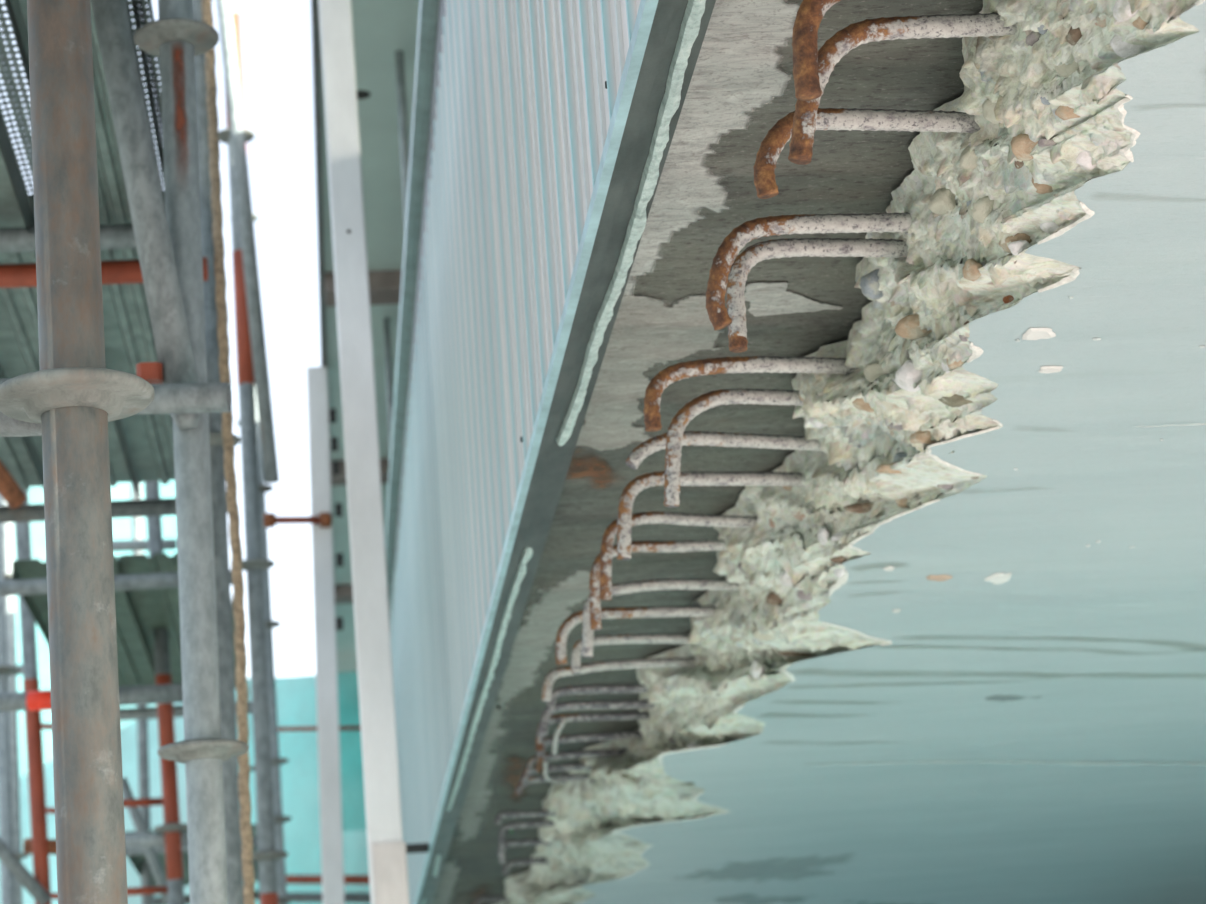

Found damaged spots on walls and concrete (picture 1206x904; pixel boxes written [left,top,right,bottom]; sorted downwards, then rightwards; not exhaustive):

peeling [432,570,590,904]
spalling [497,0,1206,904]